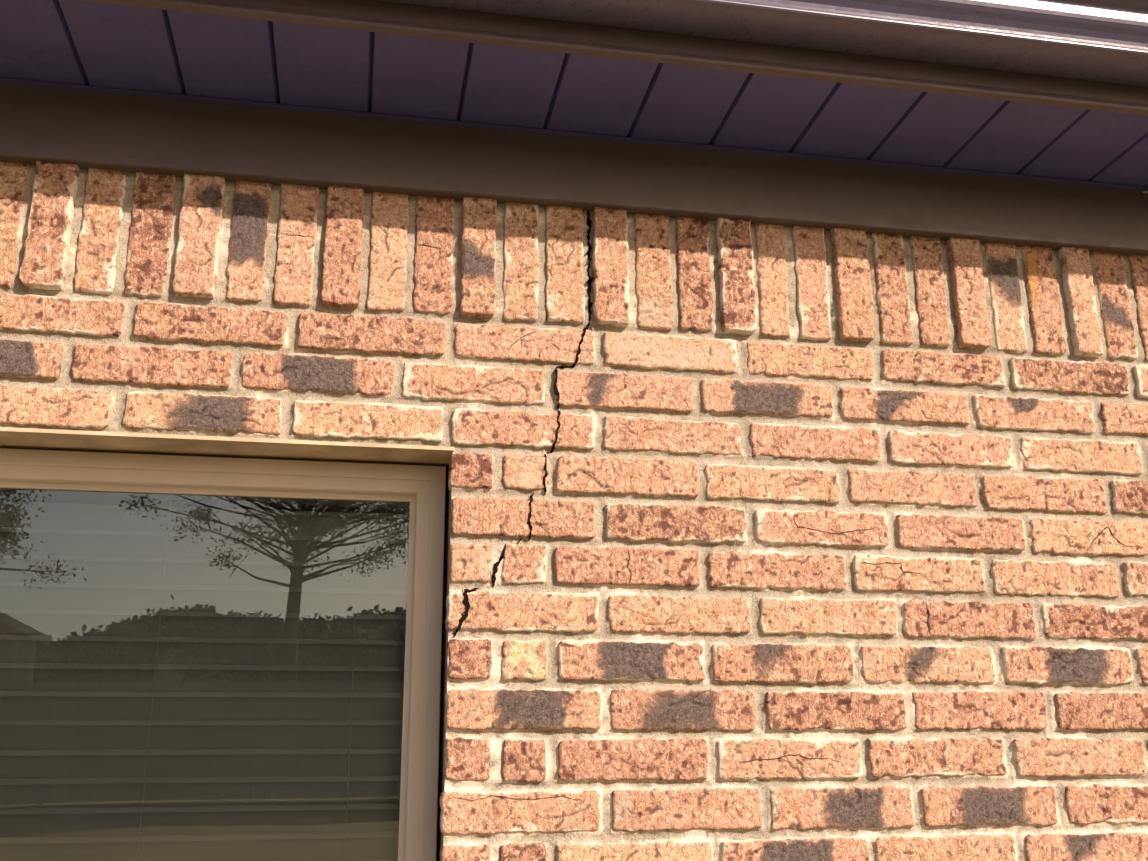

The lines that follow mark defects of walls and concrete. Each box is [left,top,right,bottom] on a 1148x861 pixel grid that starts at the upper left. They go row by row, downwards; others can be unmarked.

crack [453,211,594,637]